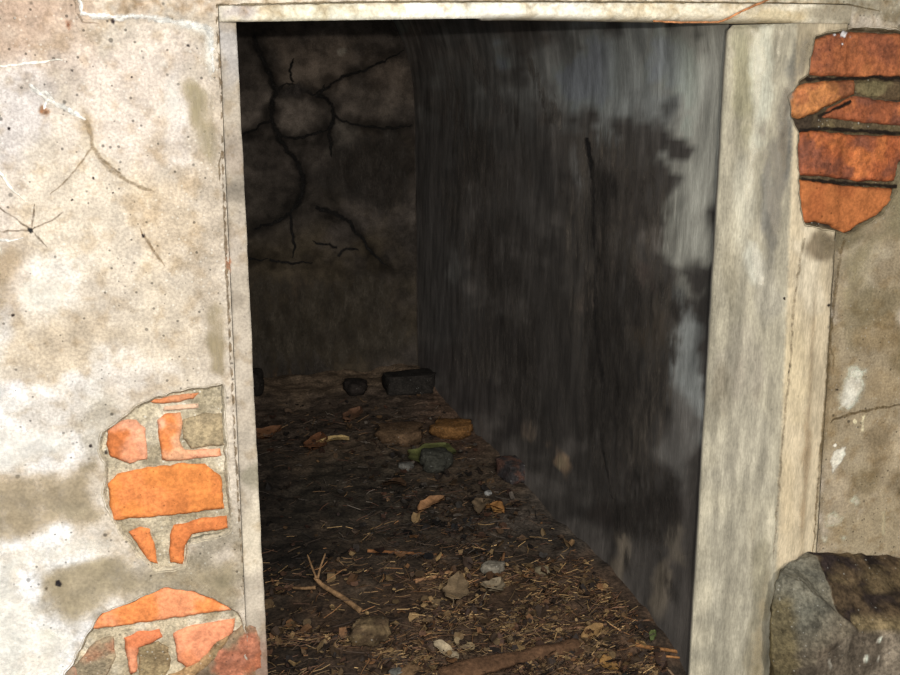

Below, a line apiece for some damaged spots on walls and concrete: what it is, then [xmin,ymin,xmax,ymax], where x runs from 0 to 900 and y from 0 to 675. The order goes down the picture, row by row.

crack [0,59,150,247]
spalling [787,26,900,236]
crack [216,0,878,595]
leakage [0,465,98,539]
spalling [97,383,232,573]
spalling [63,585,261,675]